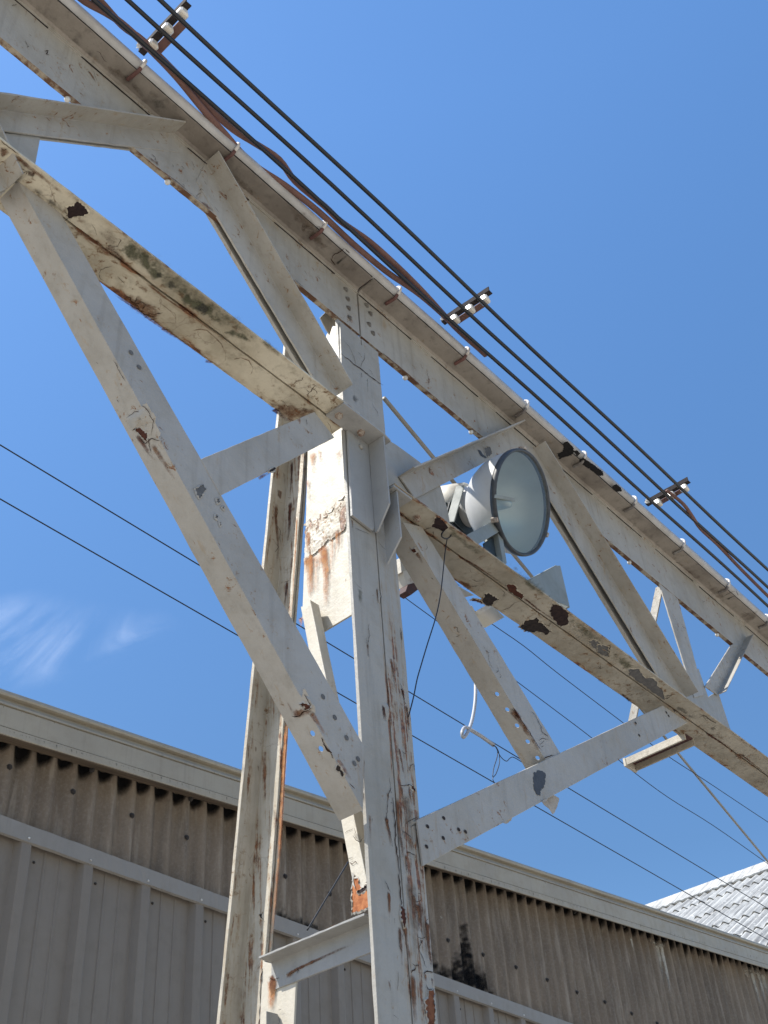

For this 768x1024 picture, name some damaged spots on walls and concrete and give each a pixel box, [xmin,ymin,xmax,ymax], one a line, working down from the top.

peeling [65,200,90,219]
water stain [126,245,247,347]
rust [135,424,166,466]
rust [275,491,338,596]
peeling [304,493,346,561]
peeling [518,605,569,635]
water stain [0,742,236,820]
rust [278,689,323,861]
water stain [286,826,347,852]
peeling [350,861,368,916]
rust [408,889,432,959]
water stain [424,867,768,994]